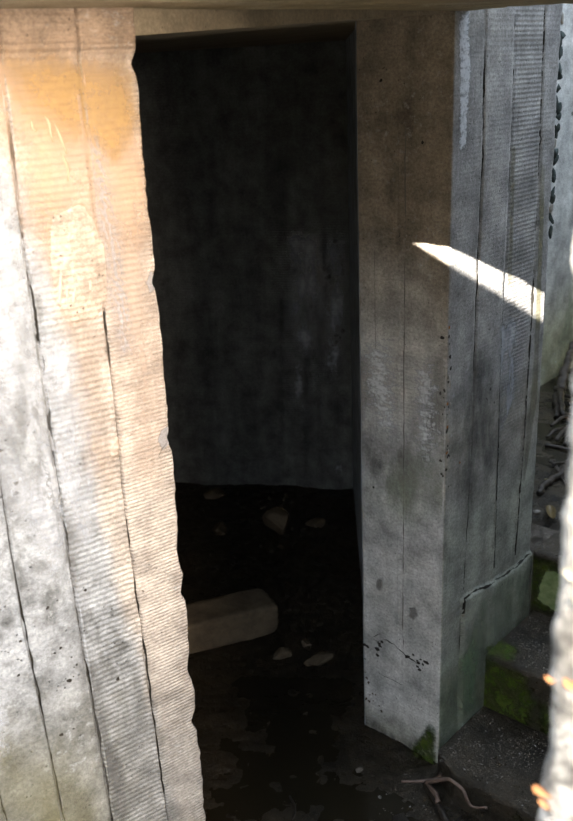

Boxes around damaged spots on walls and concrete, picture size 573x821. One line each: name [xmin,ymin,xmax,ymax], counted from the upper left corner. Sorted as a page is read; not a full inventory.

crack [475,57,486,321]
crack [537,10,545,185]
crack [460,279,534,615]
peeling [537,571,561,612]